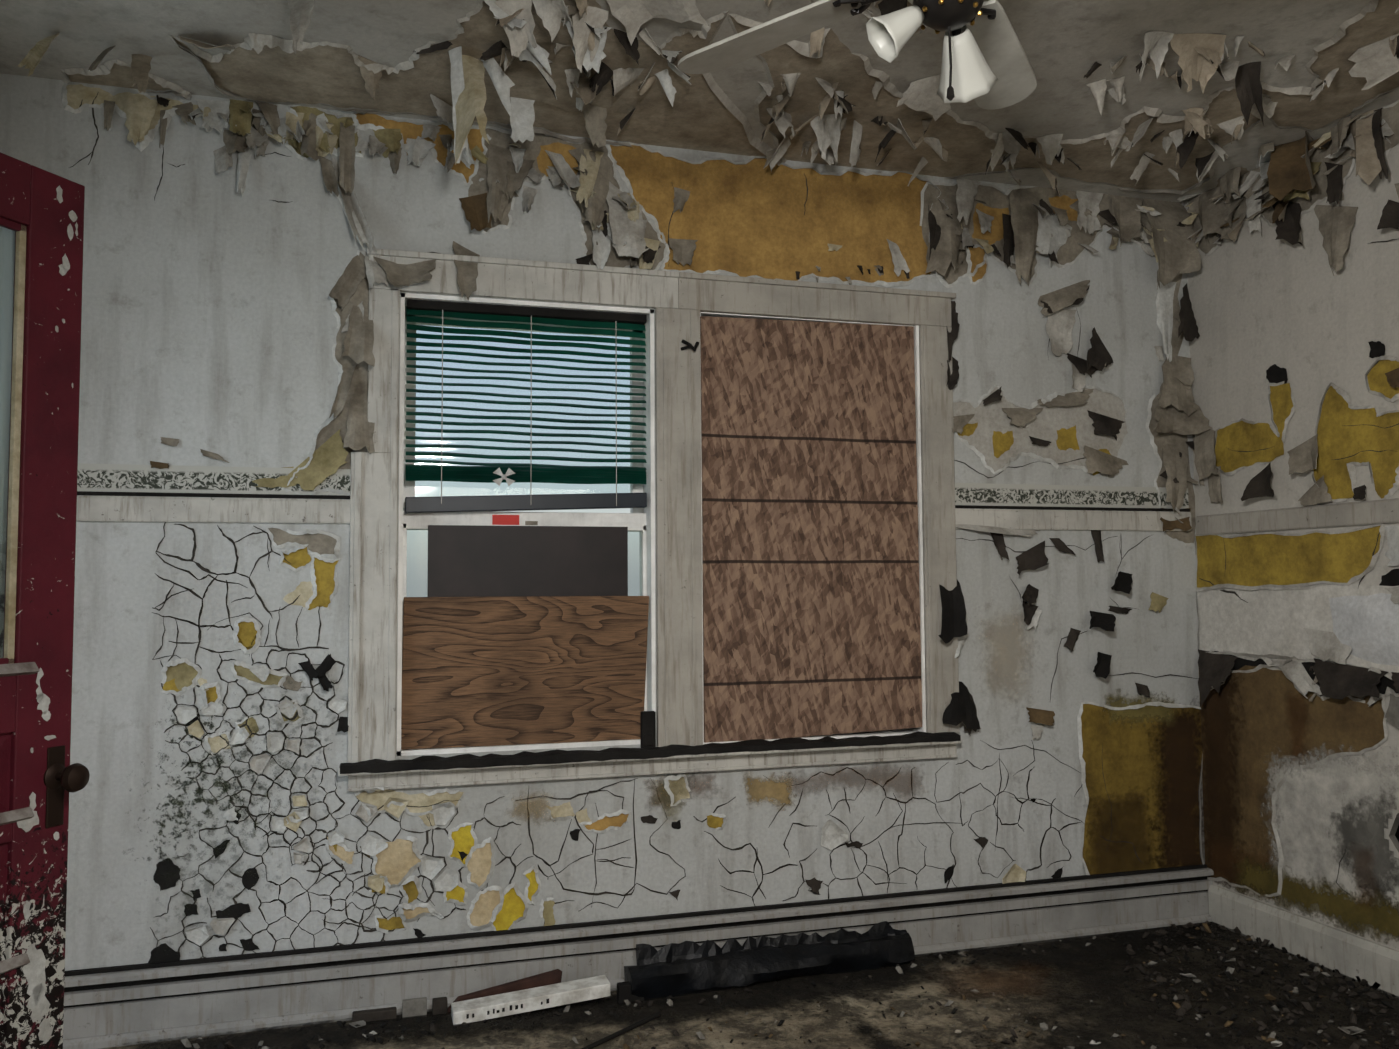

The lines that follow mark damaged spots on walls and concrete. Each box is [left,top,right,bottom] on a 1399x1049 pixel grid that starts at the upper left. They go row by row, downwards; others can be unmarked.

peeling [60,0,1399,288]
peeling [56,185,78,276]
peeling [252,250,436,496]
spalling [266,527,342,611]
flaking render [920,178,1399,909]
peeling [30,668,56,753]
spalling [161,617,336,755]
crack [150,522,1089,959]
peeling [153,858,201,916]
peeling [216,867,259,919]
damp [1237,857,1399,939]
peeling [23,943,54,1044]